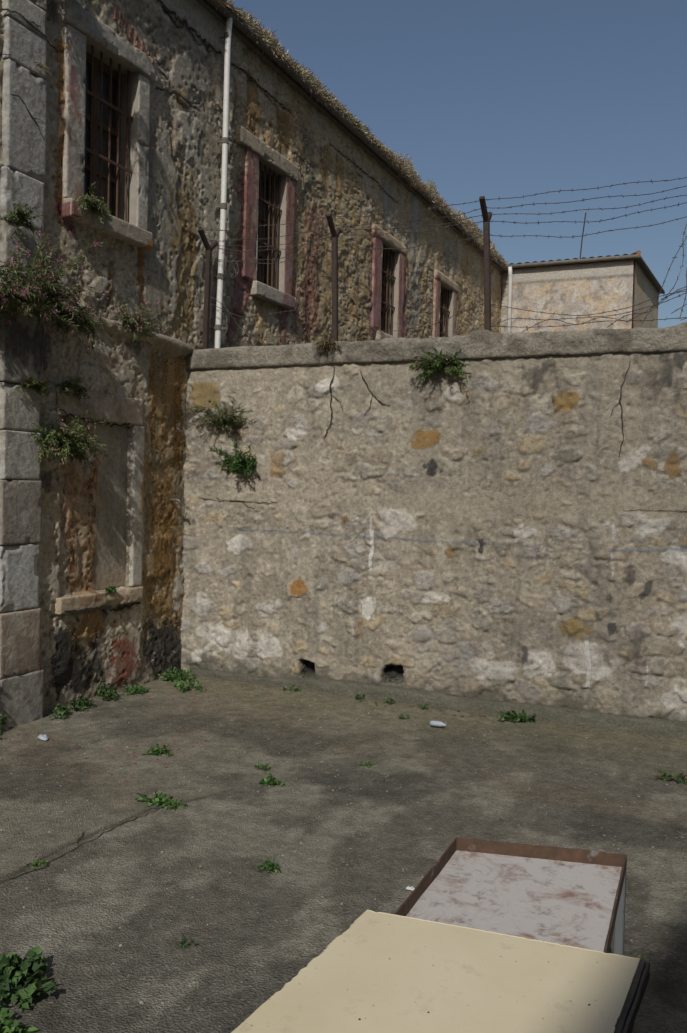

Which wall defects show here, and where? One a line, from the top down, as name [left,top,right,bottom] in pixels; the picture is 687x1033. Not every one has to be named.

crack [610,363,630,457]